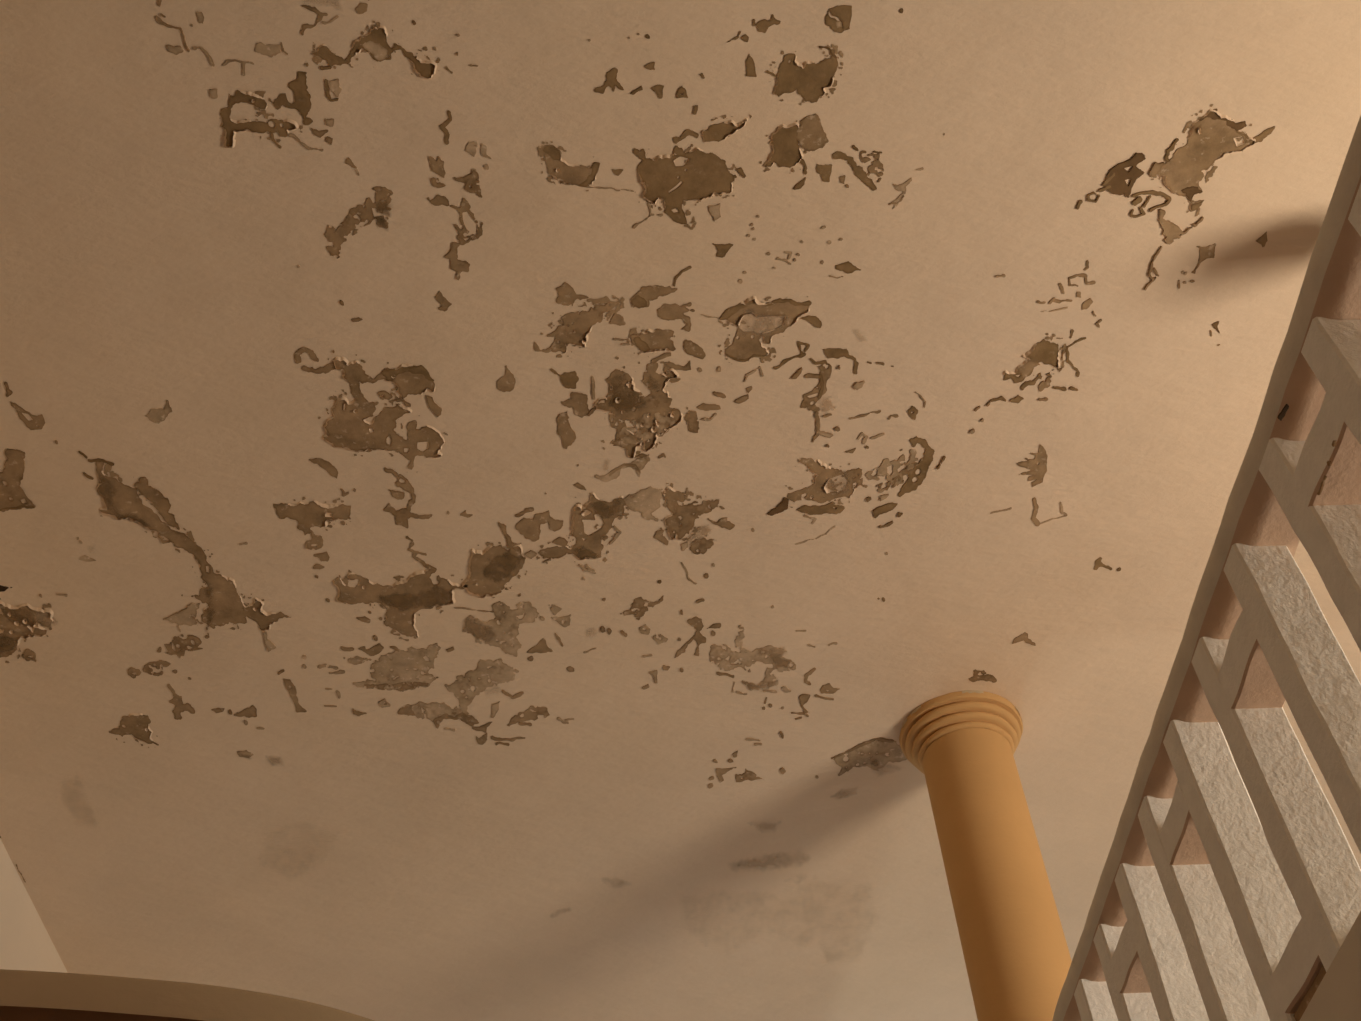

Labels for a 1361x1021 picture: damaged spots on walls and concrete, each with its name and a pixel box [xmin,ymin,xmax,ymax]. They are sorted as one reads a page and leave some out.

peeling [155,0,478,152]
peeling [324,186,393,259]
spalling [537,62,752,230]
spalling [727,5,924,208]
spalling [1076,104,1275,291]
spalling [970,333,1078,434]
spalling [0,448,36,512]
spalling [273,266,946,746]
spalling [0,585,68,663]
spalling [78,451,291,720]
peeling [109,713,159,748]
spalling [831,737,907,776]